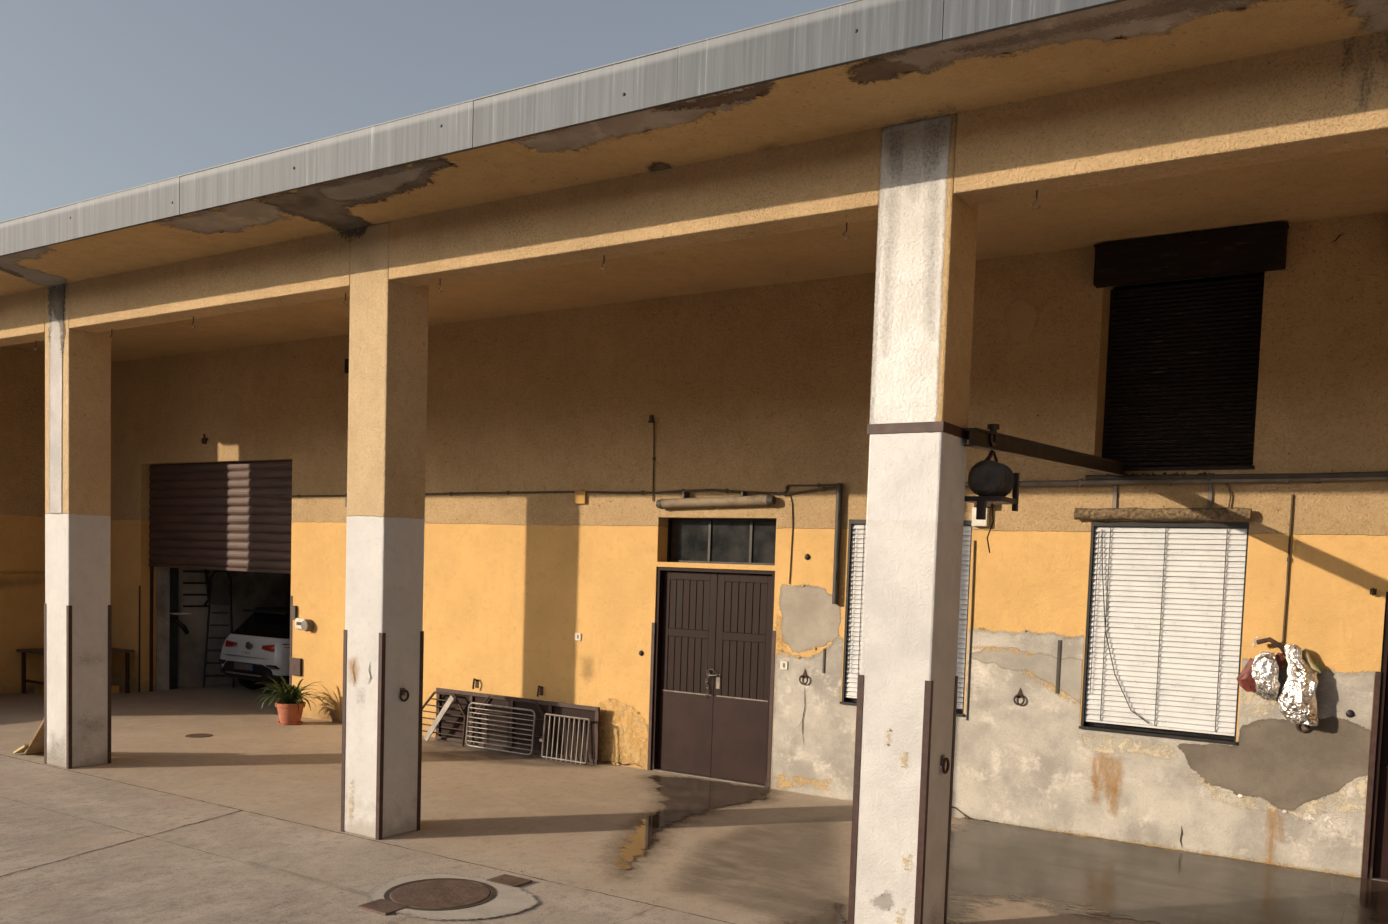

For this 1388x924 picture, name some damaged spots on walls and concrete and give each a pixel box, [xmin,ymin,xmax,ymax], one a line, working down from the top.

peeling [876,0,1288,75]
peeling [1326,0,1388,35]
peeling [506,82,778,154]
peeling [153,200,291,235]
flaking render [952,627,1375,878]